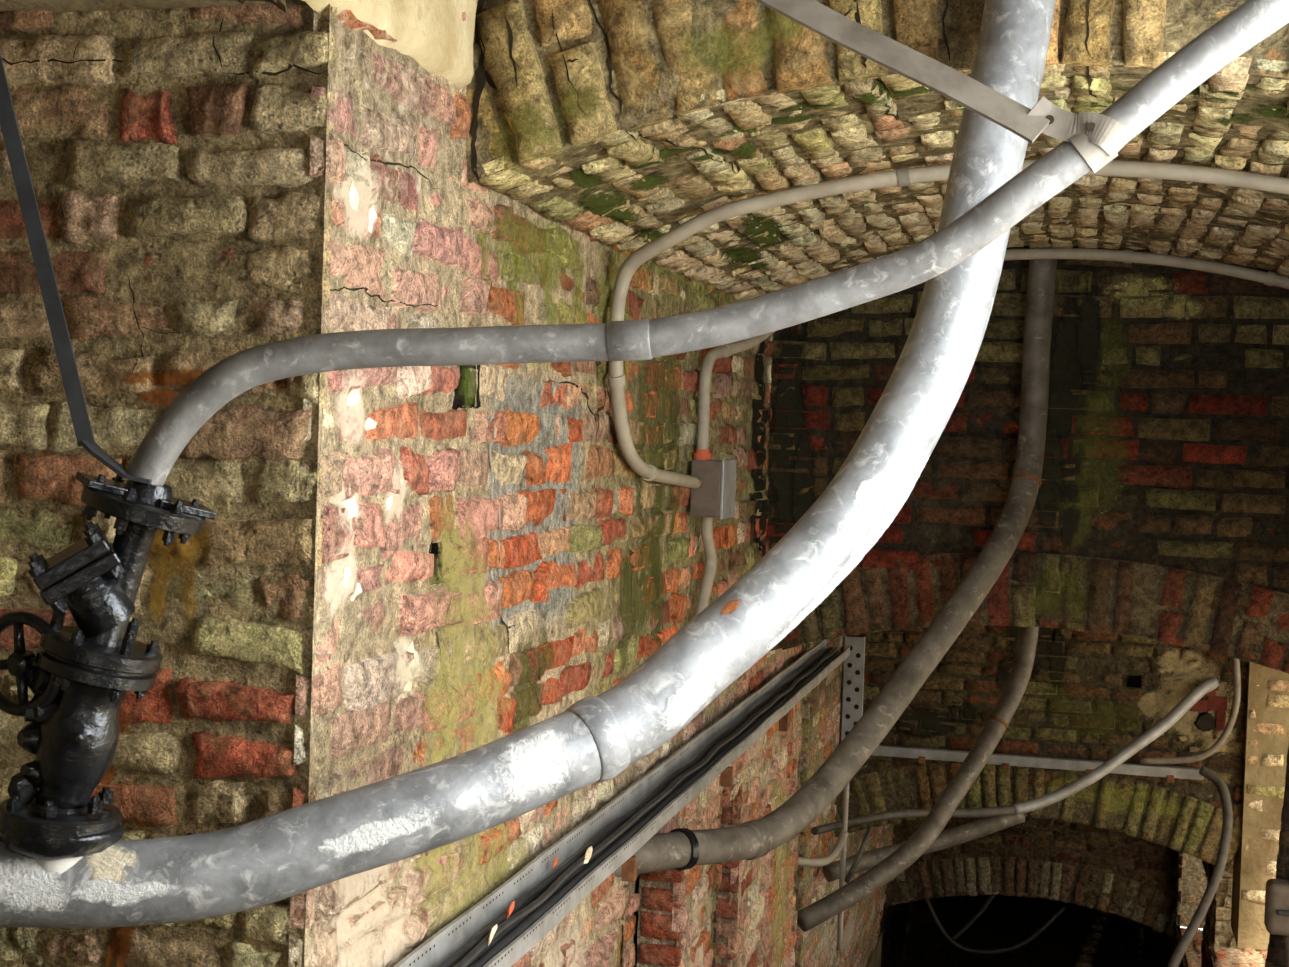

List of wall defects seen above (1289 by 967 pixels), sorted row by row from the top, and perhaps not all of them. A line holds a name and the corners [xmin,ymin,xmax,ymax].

crack [2,40,150,65]
crack [212,17,324,103]
crack [469,0,517,183]
crack [942,0,950,61]
crack [1084,0,1097,98]
crack [332,136,438,189]
corrosion [149,529,207,621]